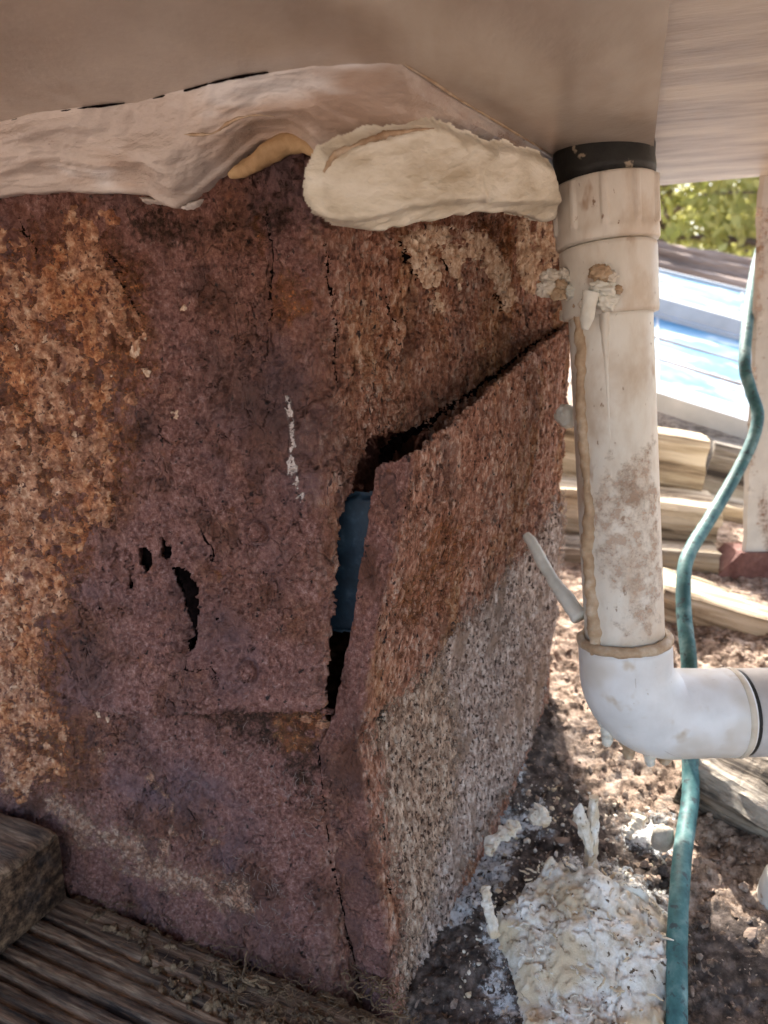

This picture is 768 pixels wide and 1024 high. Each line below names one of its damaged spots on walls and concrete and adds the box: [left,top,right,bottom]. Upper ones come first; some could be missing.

crack [379,324,561,464]
crack [317,745,360,982]